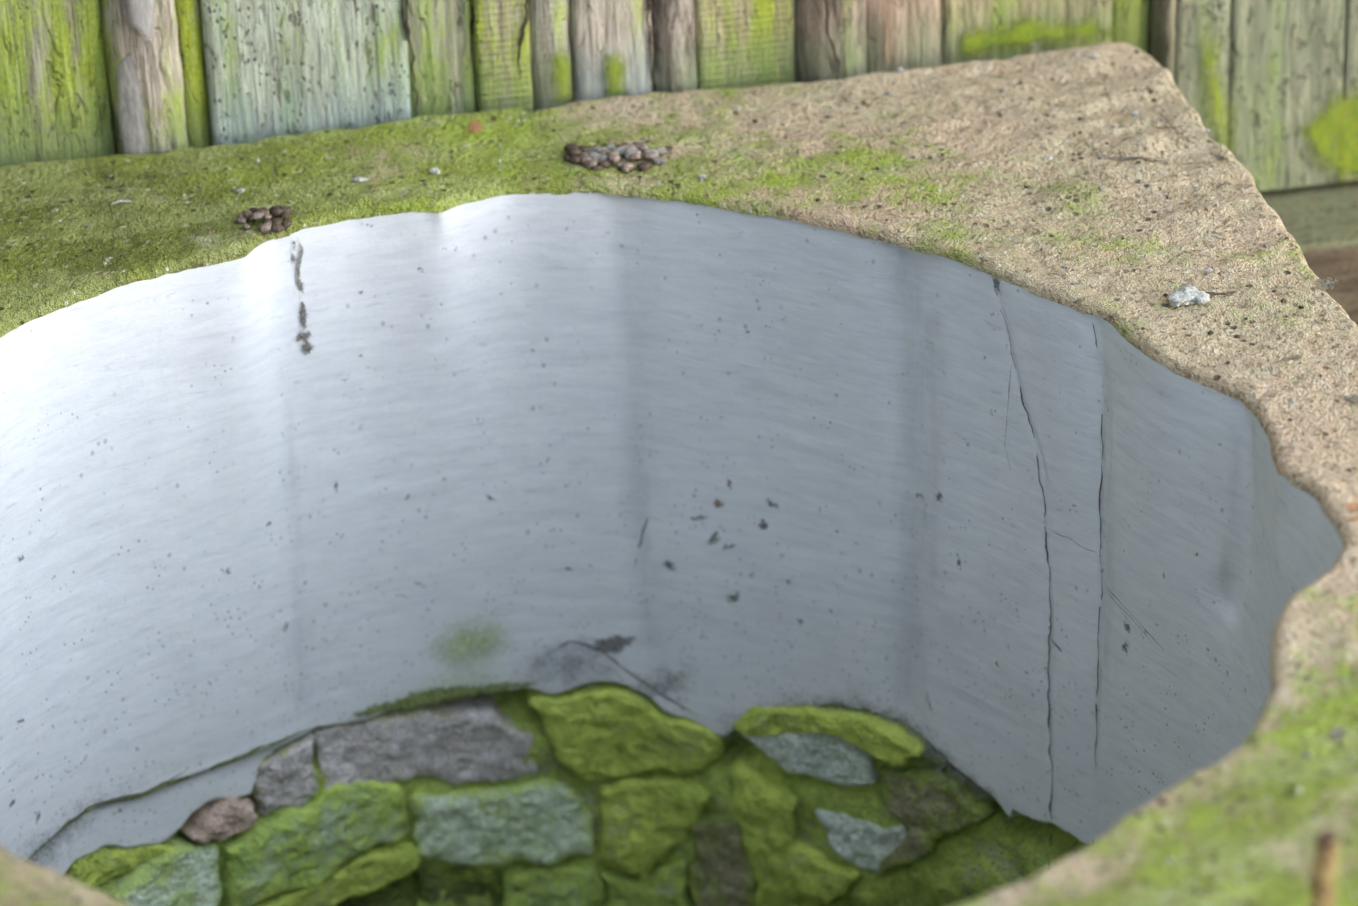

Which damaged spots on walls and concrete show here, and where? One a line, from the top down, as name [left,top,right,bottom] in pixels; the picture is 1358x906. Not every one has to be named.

crack [992,276,1163,866]